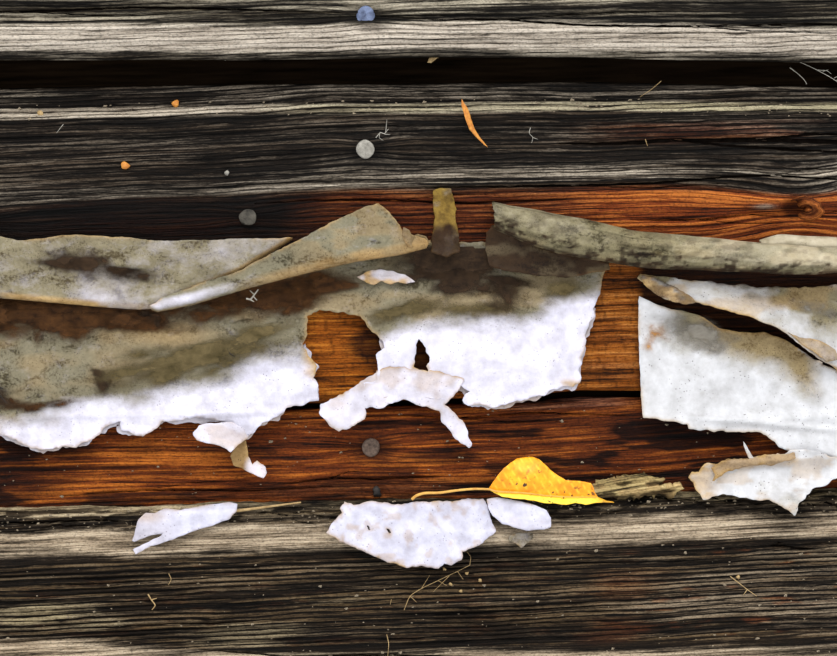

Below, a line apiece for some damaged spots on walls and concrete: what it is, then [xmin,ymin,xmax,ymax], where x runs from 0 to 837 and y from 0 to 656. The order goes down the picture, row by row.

leakage [37,253,150,281]
leakage [0,271,361,341]
leakage [91,324,287,393]
leakage [0,389,72,412]